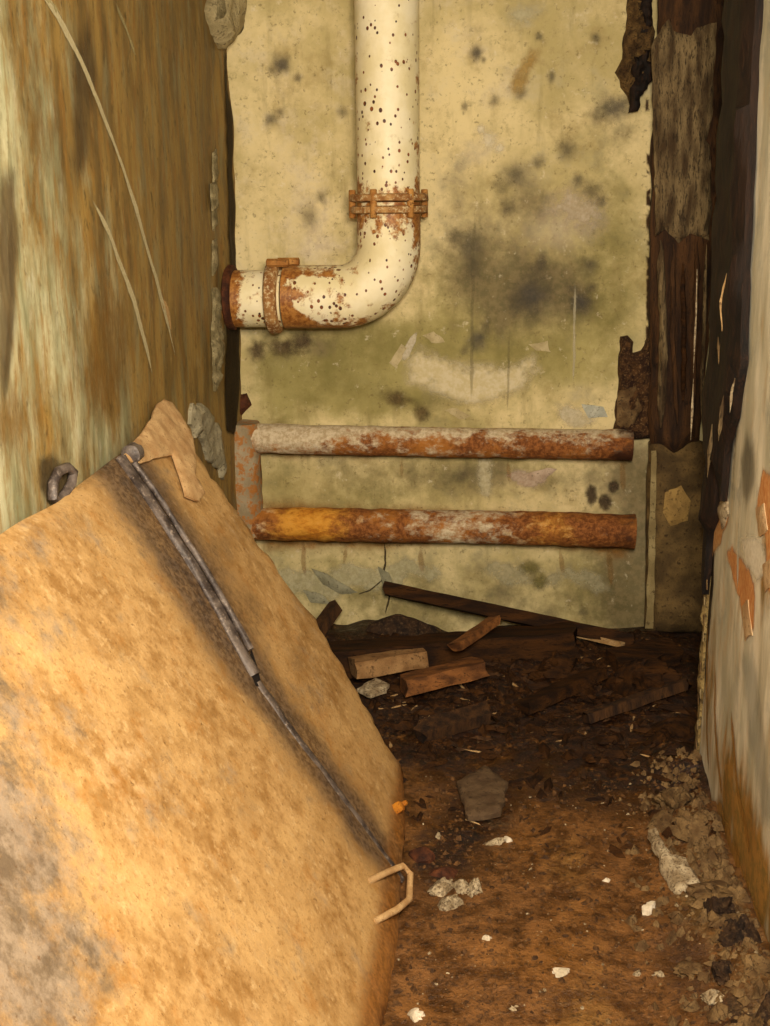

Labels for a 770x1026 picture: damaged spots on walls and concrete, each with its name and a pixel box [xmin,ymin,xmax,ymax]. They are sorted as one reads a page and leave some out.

spalling [204,0,247,50]
peeling [712,470,770,641]